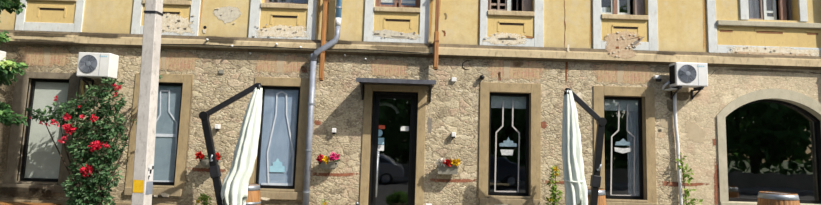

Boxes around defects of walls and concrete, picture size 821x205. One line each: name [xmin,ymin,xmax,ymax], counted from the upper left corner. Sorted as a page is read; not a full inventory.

flaking render [161,13,207,34]
peeling [213,6,242,24]
flaking render [252,24,307,38]
flaking render [482,32,533,45]
flaking render [593,30,653,85]